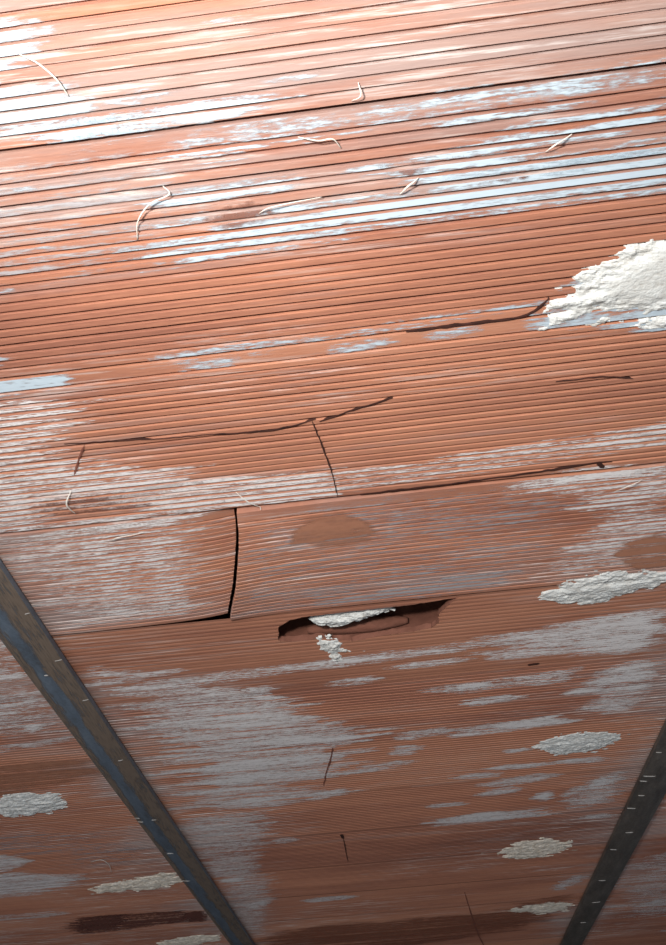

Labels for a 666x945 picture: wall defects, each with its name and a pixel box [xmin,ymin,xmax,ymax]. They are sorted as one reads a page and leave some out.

damp [0,17,51,71]
damp [0,58,666,275]
crack [406,296,549,332]
damp [475,302,666,332]
damp [0,374,666,626]
crack [64,396,612,497]
damp [0,642,74,752]
spalling [51,582,666,708]
damp [84,609,666,945]
damp [0,834,141,897]